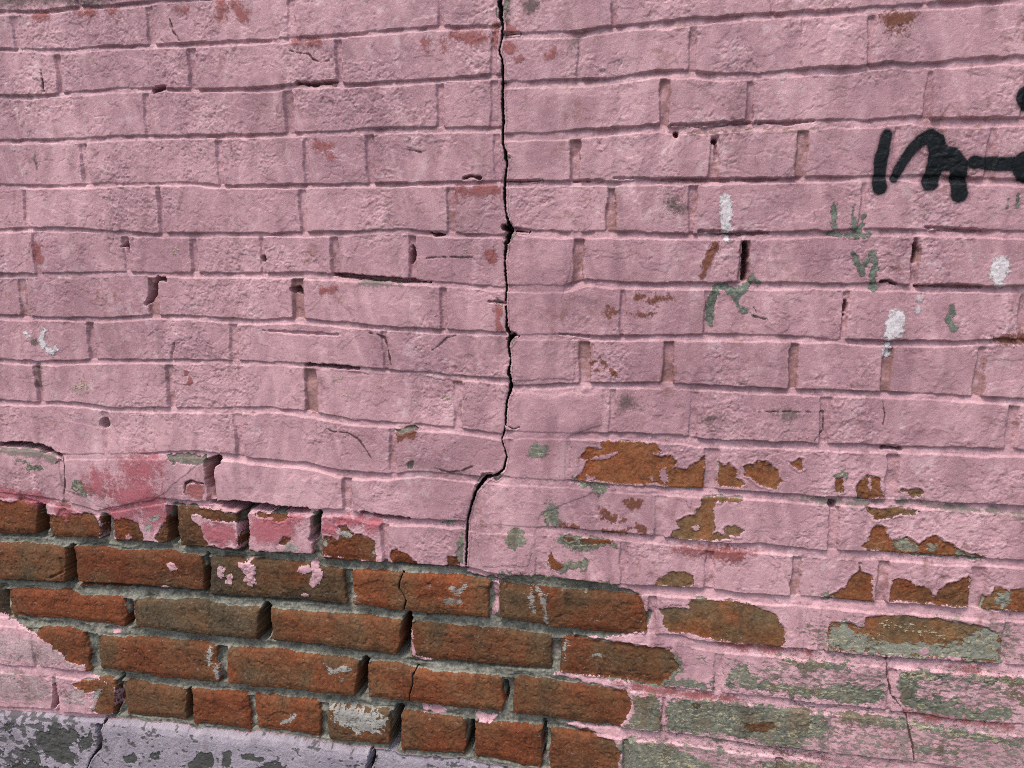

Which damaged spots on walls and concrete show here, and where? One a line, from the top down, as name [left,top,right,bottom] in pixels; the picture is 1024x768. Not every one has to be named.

crack [436,0,543,567]
peeling [14,459,44,474]
spalling [167,452,221,465]
crack [326,428,371,458]
spalling [395,425,418,435]
peeling [526,441,551,460]
peeling [571,439,783,543]
peeling [0,469,1024,768]